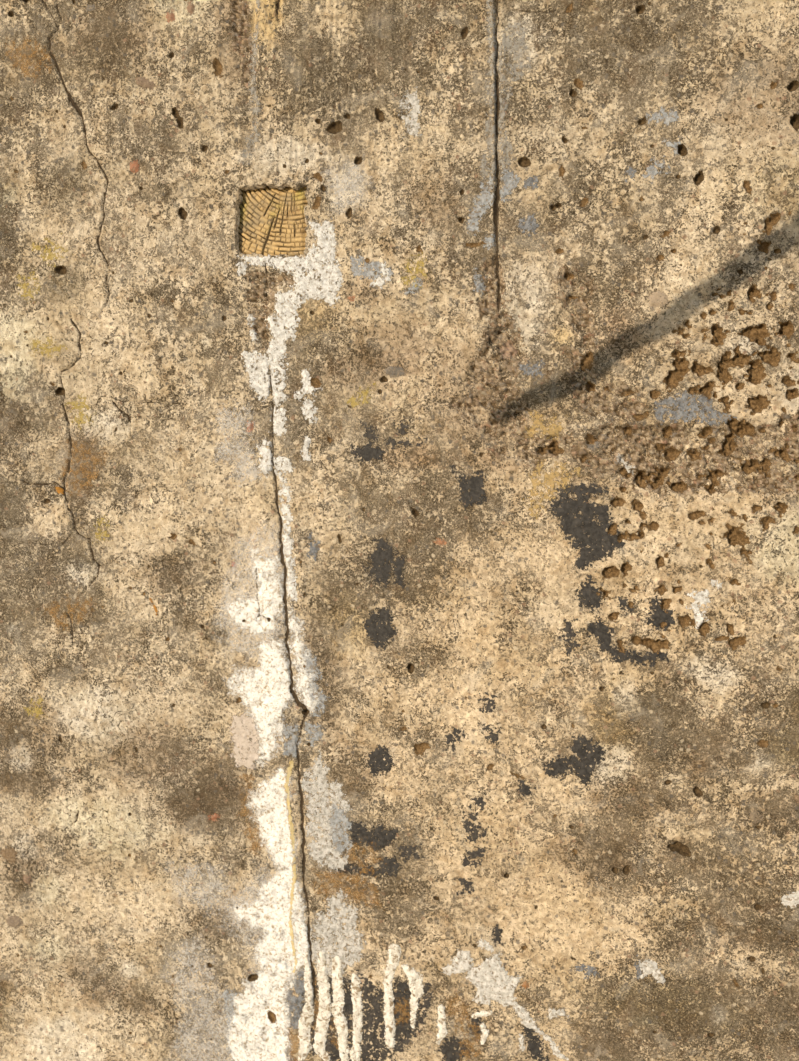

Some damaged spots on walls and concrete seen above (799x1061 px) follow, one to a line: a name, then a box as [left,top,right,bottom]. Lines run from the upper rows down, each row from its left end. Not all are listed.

crack [11,0,201,589]
crack [493,0,556,312]
crack [256,375,316,1006]